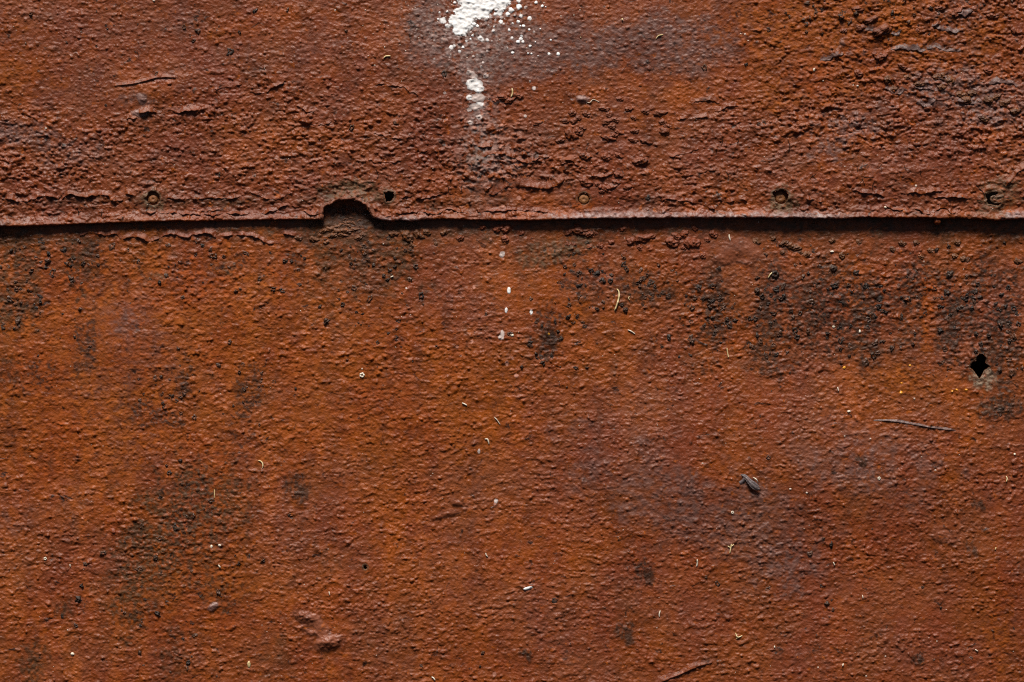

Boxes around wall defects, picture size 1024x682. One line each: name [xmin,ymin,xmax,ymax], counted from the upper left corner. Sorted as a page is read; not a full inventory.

water stain [409,3,744,84]
rust [708,0,1021,122]
rust [555,96,672,194]
rust [532,223,719,361]
spalling [527,240,1024,378]
rust [685,236,1024,419]
rust [0,204,516,668]